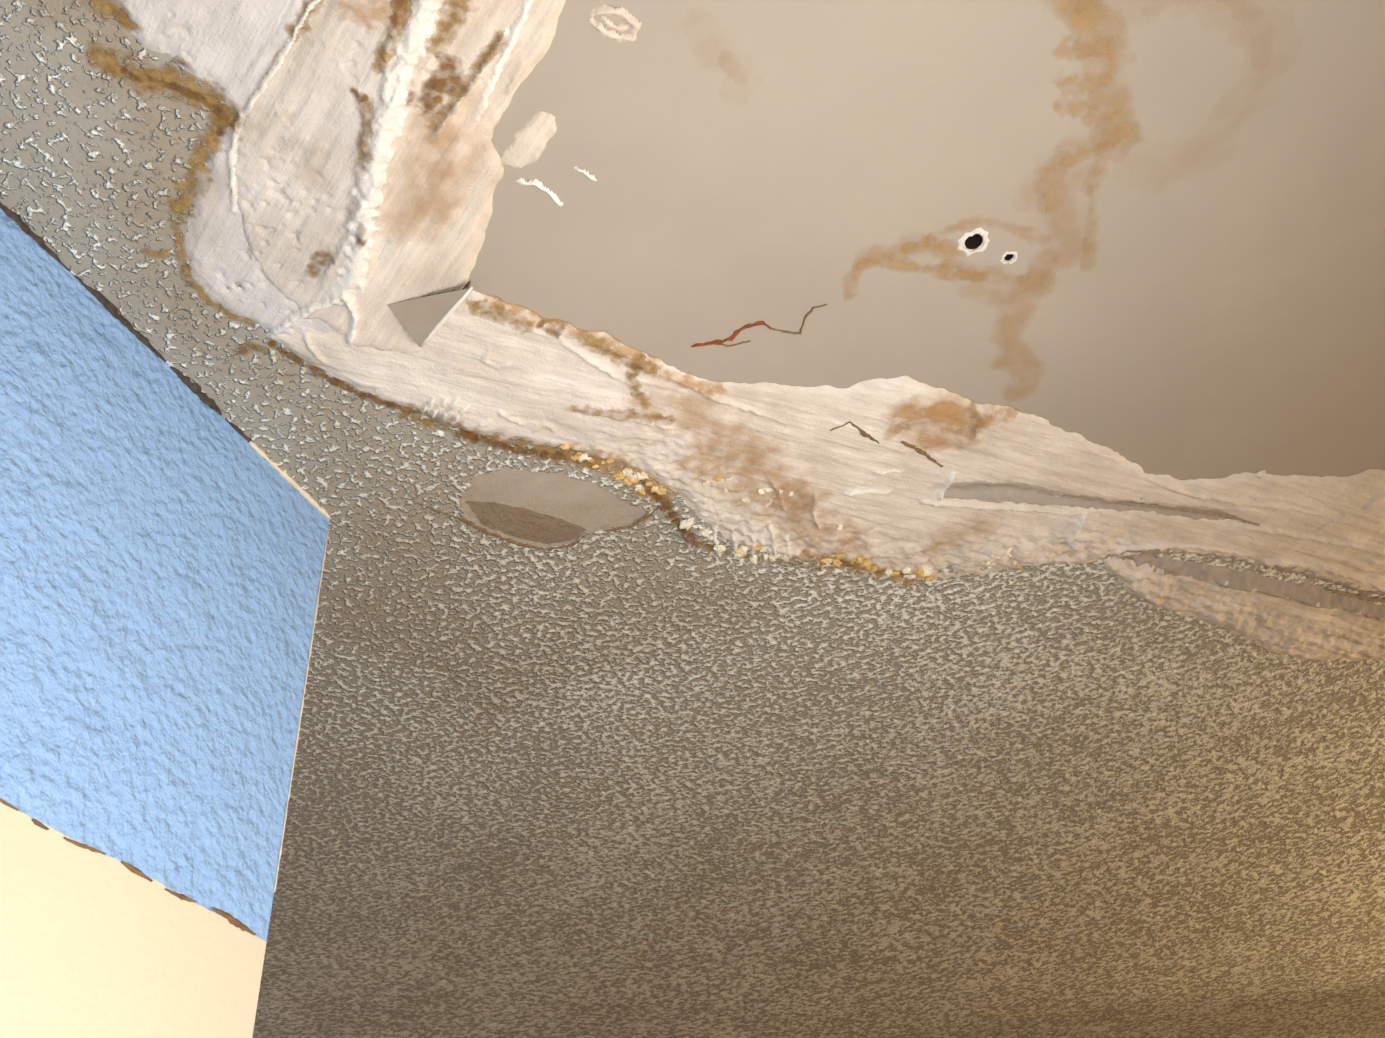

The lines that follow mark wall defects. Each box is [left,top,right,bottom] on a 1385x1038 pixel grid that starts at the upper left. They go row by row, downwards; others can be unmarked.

spalling [957,228,990,257]
spalling [1000,251,1018,264]
crack [691,304,827,348]
corrosion [896,402,982,447]
corrosion [239,340,728,554]
spalling [414,443,667,551]
peeling [703,476,795,508]
peeling [679,519,789,565]
corrosion [745,550,912,583]
peeling [813,553,935,581]